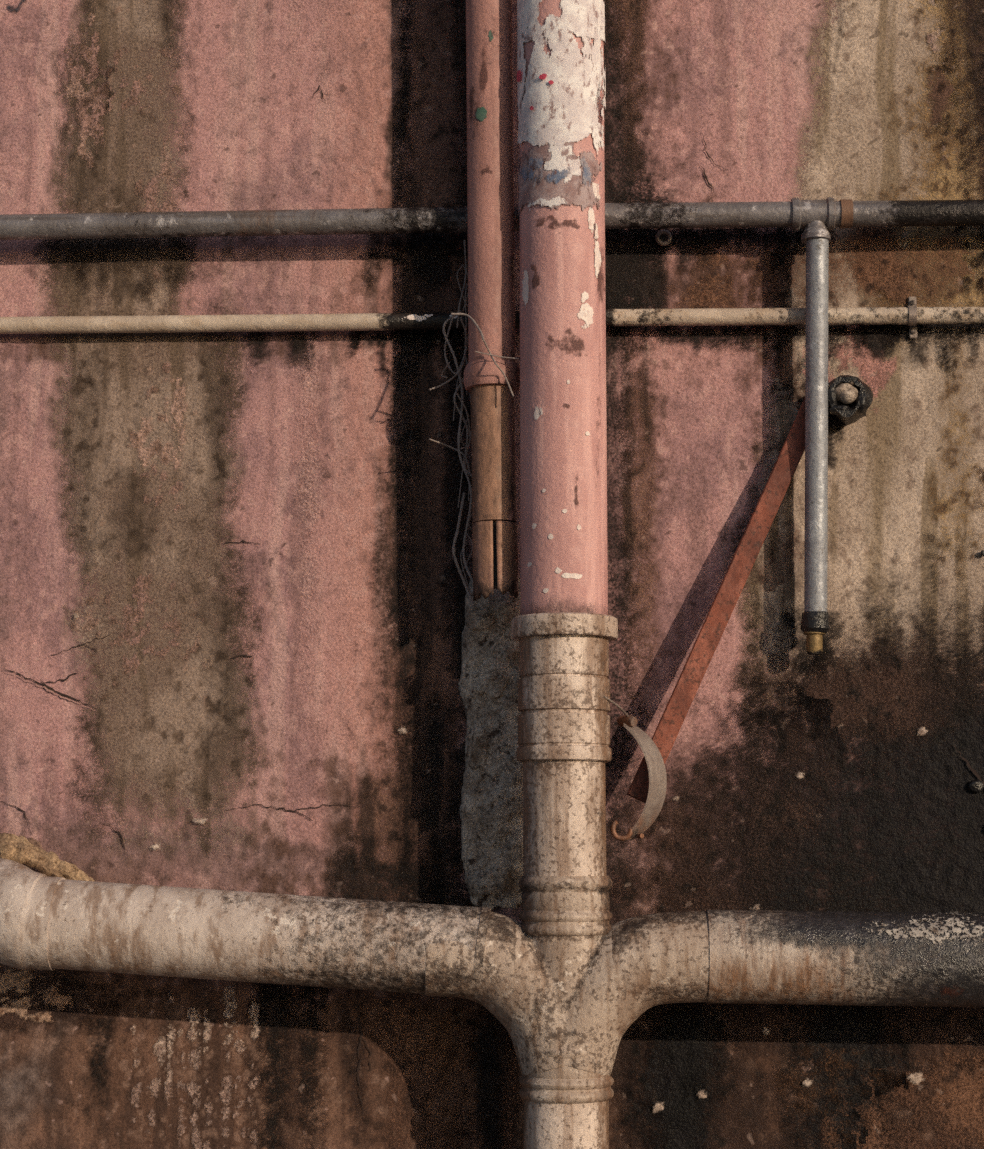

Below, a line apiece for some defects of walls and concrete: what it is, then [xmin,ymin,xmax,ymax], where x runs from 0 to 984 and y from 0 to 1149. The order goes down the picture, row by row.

damp [51,0,186,213]
damp [386,0,467,208]
damp [40,237,198,316]
damp [368,233,468,313]
crack [6,634,111,711]
damp [47,332,272,864]
damp [326,330,475,907]
spalling [0,832,94,881]
spalling [0,965,75,1022]
damp [131,983,325,1149]
damp [622,1002,726,1149]
damp [778,1005,913,1149]